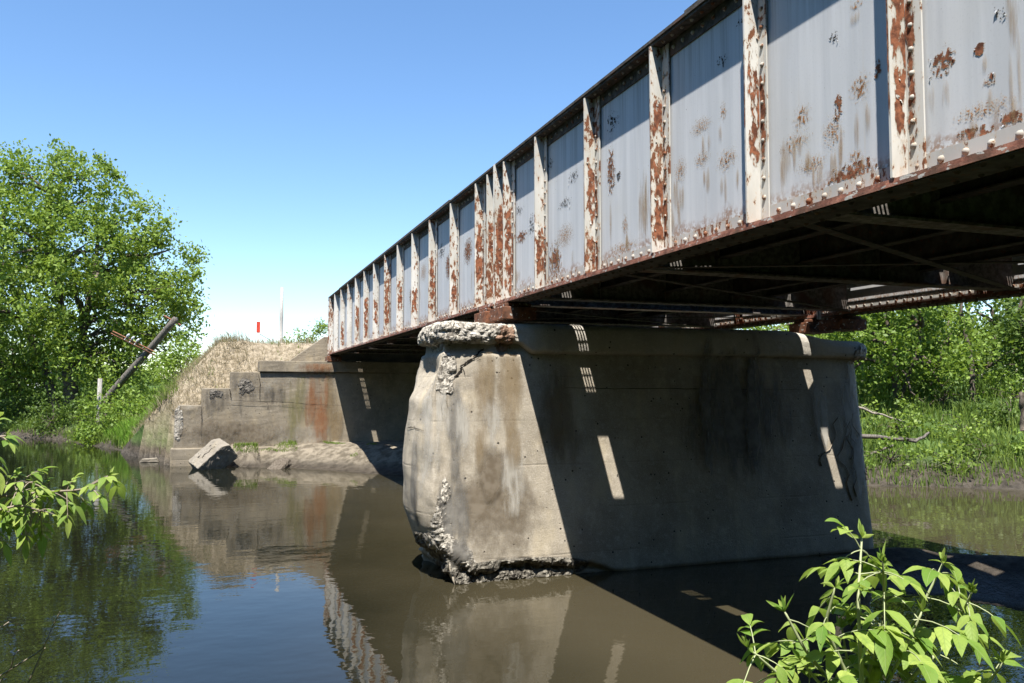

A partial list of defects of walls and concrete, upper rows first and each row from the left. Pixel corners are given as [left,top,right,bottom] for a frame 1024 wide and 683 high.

spalling [328,240,516,394]
damp [479,360,520,431]
damp [425,393,531,567]
spalling [414,477,588,585]